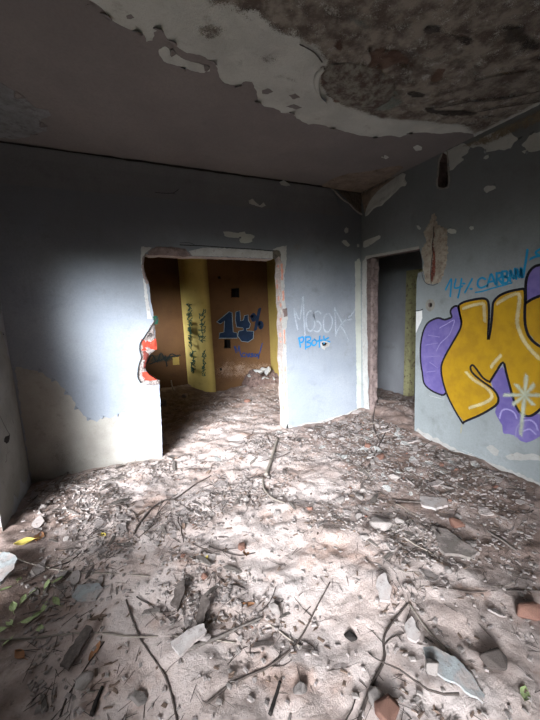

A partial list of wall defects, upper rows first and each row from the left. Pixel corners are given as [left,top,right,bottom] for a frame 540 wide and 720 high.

peeling [90,0,540,190]
flaking render [322,155,407,216]
damp [209,0,540,147]
spalling [137,213,456,428]
peeling [0,331,162,532]
peeling [416,428,540,486]